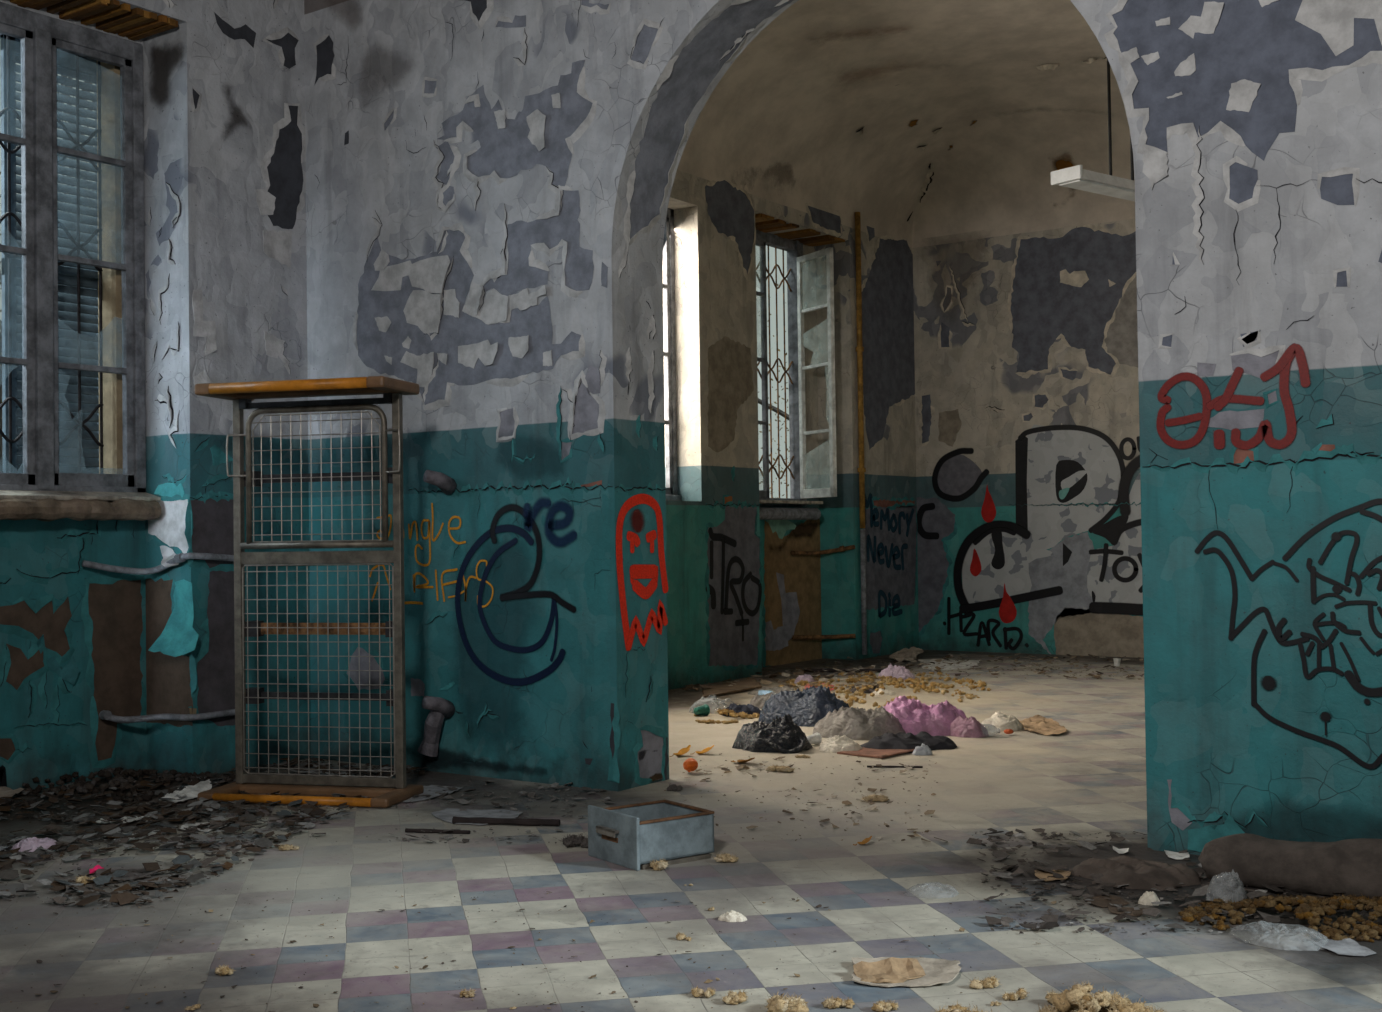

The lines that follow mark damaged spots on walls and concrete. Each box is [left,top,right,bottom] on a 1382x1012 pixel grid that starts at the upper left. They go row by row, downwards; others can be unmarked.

peeling [214,12,336,84]
peeling [255,103,306,229]
peeling [353,60,608,465]
peeling [466,0,526,30]
peeling [623,0,793,246]
peeling [705,180,756,280]
peeling [862,226,962,450]
corrosion [1054,157,1074,170]
peeling [1007,224,1138,380]
peeling [1104,0,1382,211]
crack [1143,414,1382,529]
peeling [0,482,248,779]